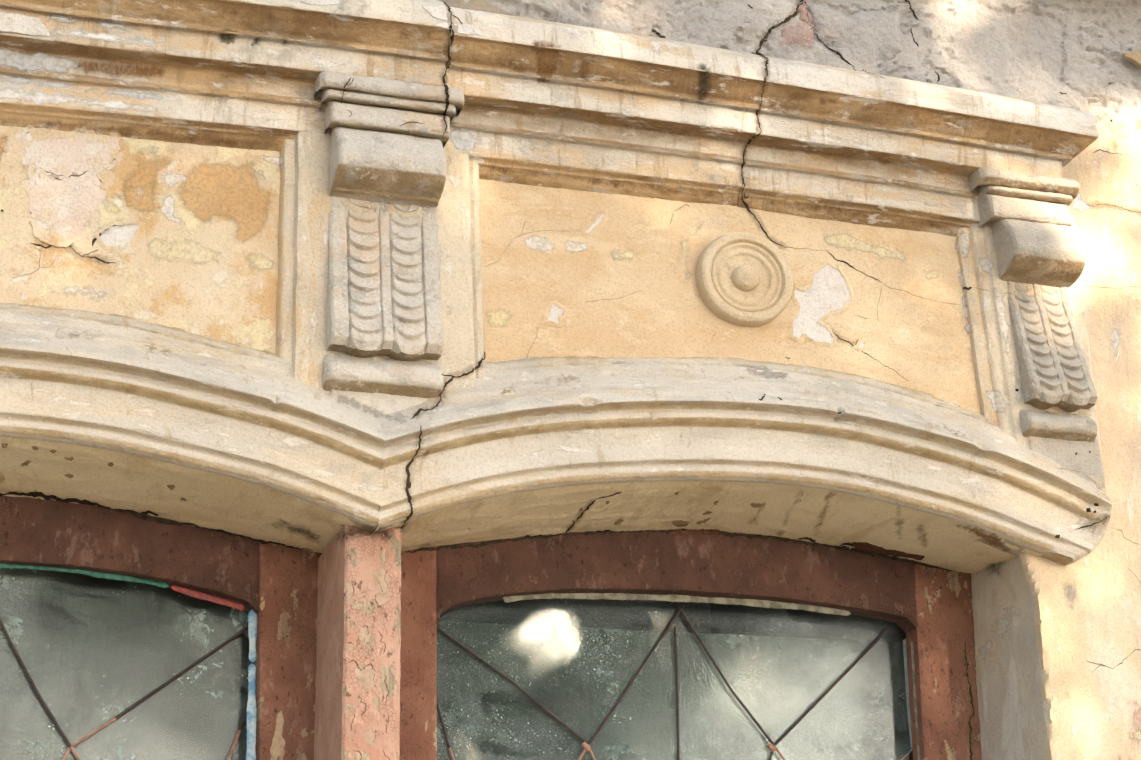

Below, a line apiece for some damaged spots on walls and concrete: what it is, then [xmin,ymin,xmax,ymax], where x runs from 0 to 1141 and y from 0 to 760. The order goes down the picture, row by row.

flaking render [422,0,517,36]
flaking render [555,0,905,68]
crack [741,0,1013,381]
crack [13,225,119,278]
flaking render [535,299,569,329]
flaking render [787,261,857,348]
crack [348,352,956,760]
peeling [345,580,354,606]